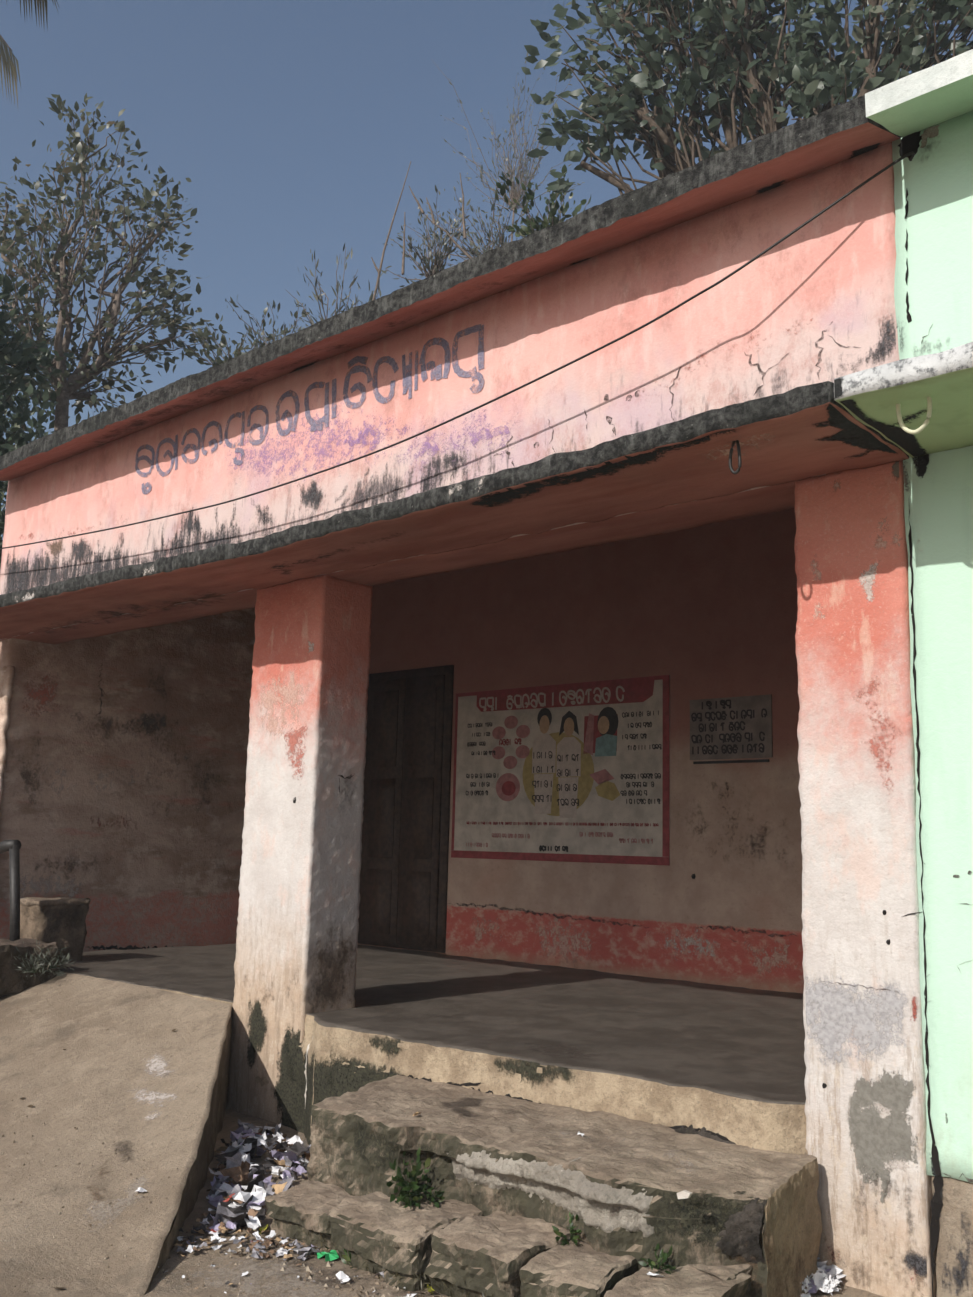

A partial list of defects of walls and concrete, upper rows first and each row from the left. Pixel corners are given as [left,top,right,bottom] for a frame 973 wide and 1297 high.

crack [904,189,933,343]
crack [669,367,681,422]
crack [744,321,860,395]
damp [340,452,491,509]
damp [5,481,322,594]
peeling [859,563,878,601]
damp [247,1001,267,1068]
damp [273,1030,397,1145]
spalling [447,1150,655,1237]
damp [942,1222,970,1295]